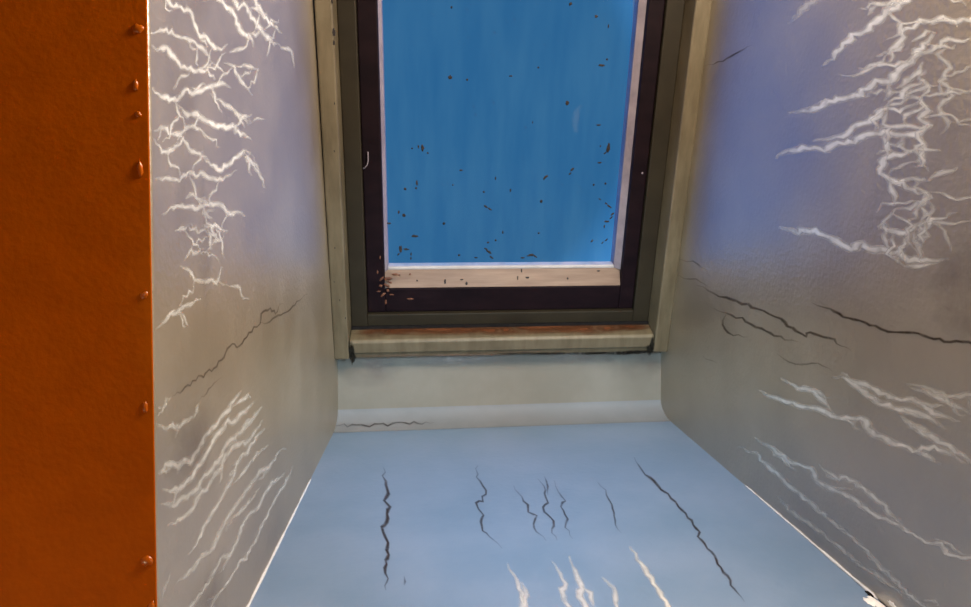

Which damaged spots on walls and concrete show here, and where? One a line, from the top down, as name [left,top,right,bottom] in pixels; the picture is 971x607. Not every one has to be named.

water stain [218,0,278,52]
water stain [155,0,264,182]
water stain [782,0,971,268]
water stain [171,190,238,216]
crack [724,297,827,338]
crack [834,311,971,344]
water stain [165,396,256,502]
water stain [771,378,971,459]
crack [381,480,391,578]
crack [643,472,734,589]
water stain [759,448,971,607]
water stain [636,554,671,607]